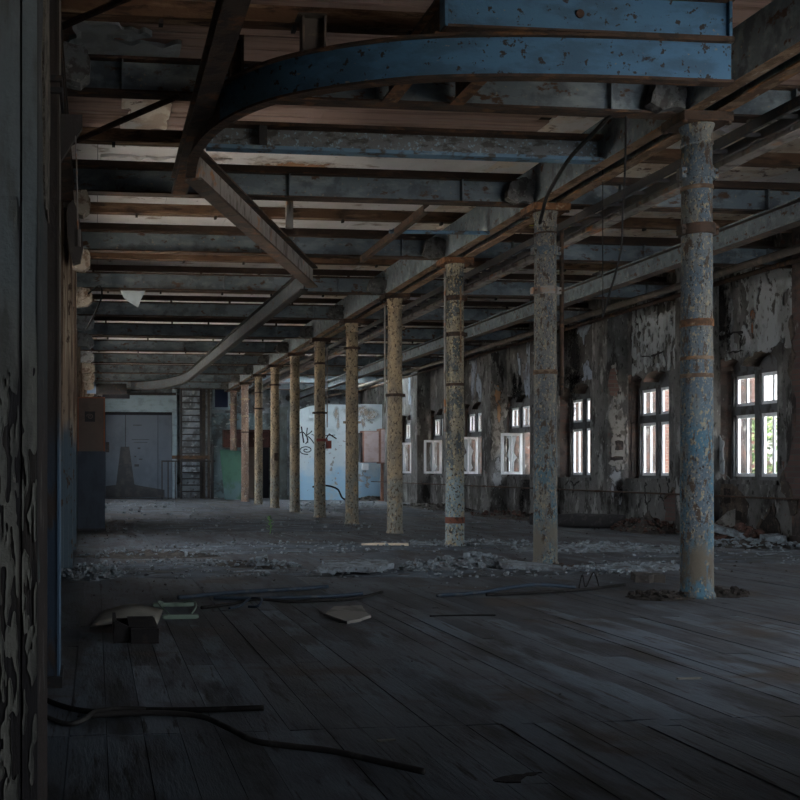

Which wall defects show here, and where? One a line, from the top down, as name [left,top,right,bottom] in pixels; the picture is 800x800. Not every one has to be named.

peeling [632,301,675,377]
peeling [719,268,792,361]
peeling [0,0,50,800]
flaking render [608,403,628,472]